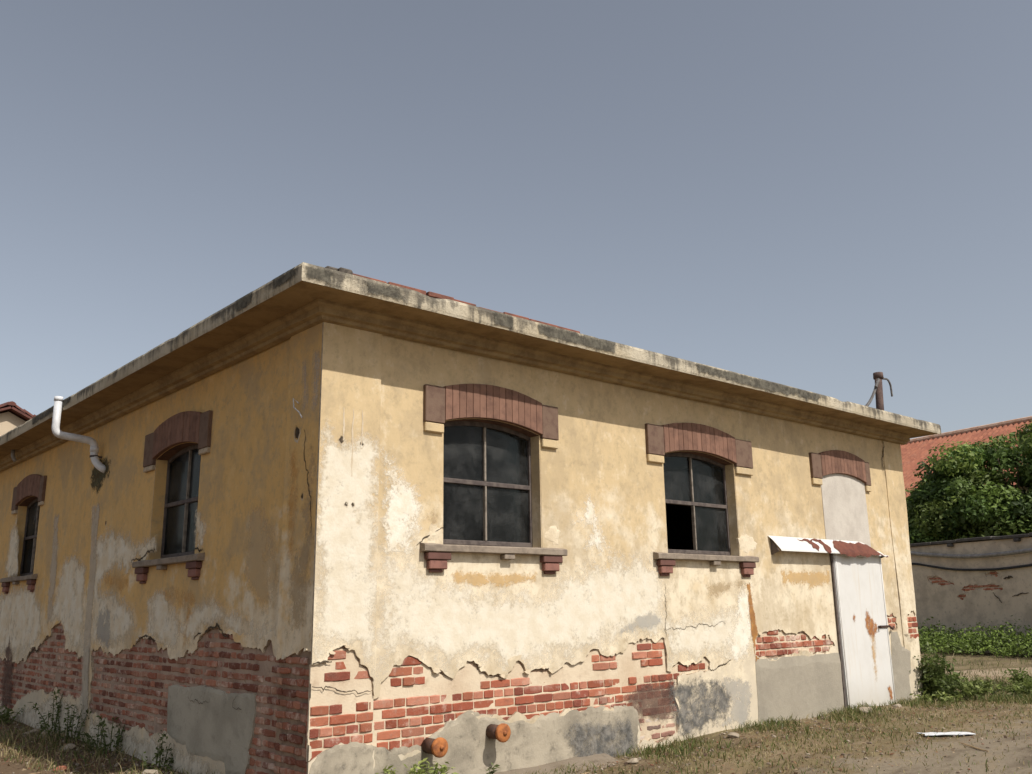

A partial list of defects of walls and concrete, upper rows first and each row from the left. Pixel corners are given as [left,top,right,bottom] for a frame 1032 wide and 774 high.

rust [798,539,888,558]
water stain [0,506,221,774]
peeling [0,425,833,774]
crack [664,588,726,640]
rust [853,612,877,672]
spalling [887,612,919,638]
spalling [929,572,1003,600]
water stain [669,678,751,735]